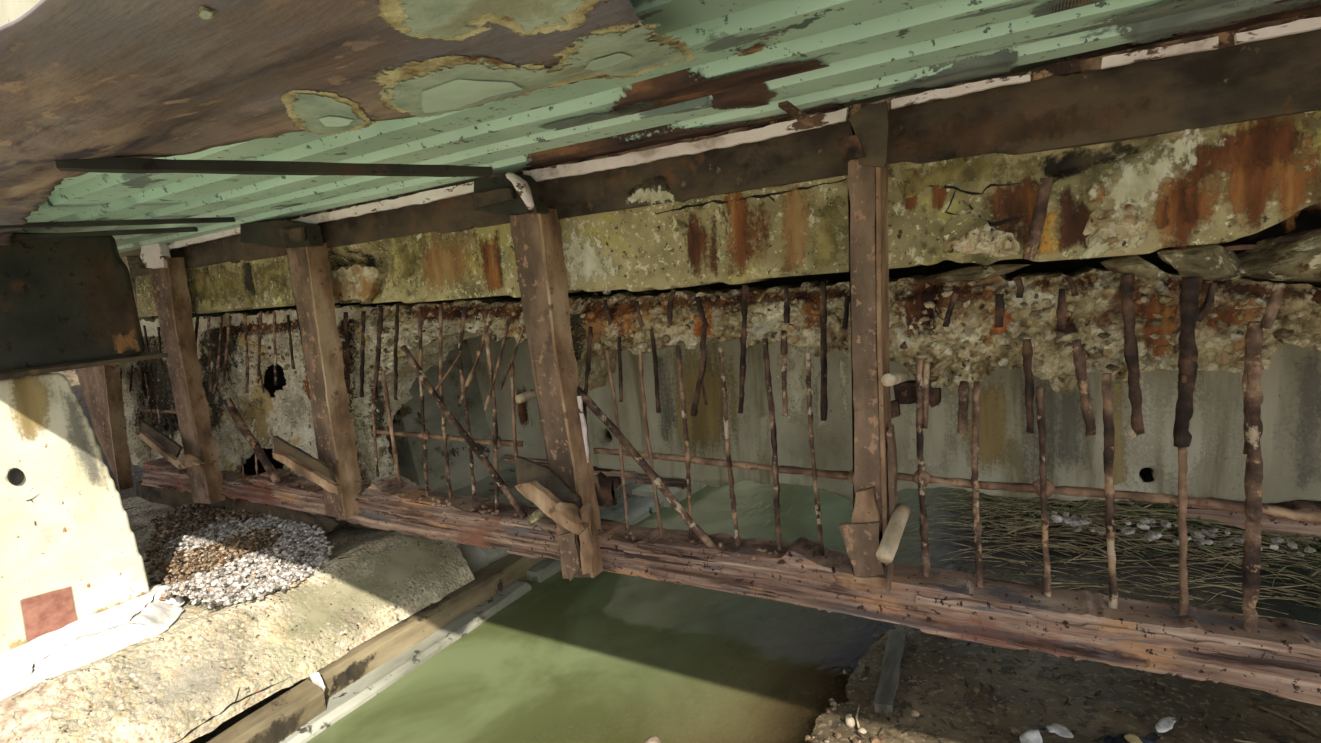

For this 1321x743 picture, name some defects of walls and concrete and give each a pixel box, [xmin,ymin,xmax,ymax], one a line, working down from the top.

peeling [1086,0,1321,44]
peeling [890,48,1018,89]
rust [0,0,844,246]
peeling [540,101,661,131]
crack [903,183,1025,239]
rust [984,174,1105,254]
rust [1151,116,1321,250]
leakage [330,247,386,270]
rust [580,192,850,340]
spalling [331,264,527,373]
rust [895,282,1015,338]
flaking render [900,277,1172,371]